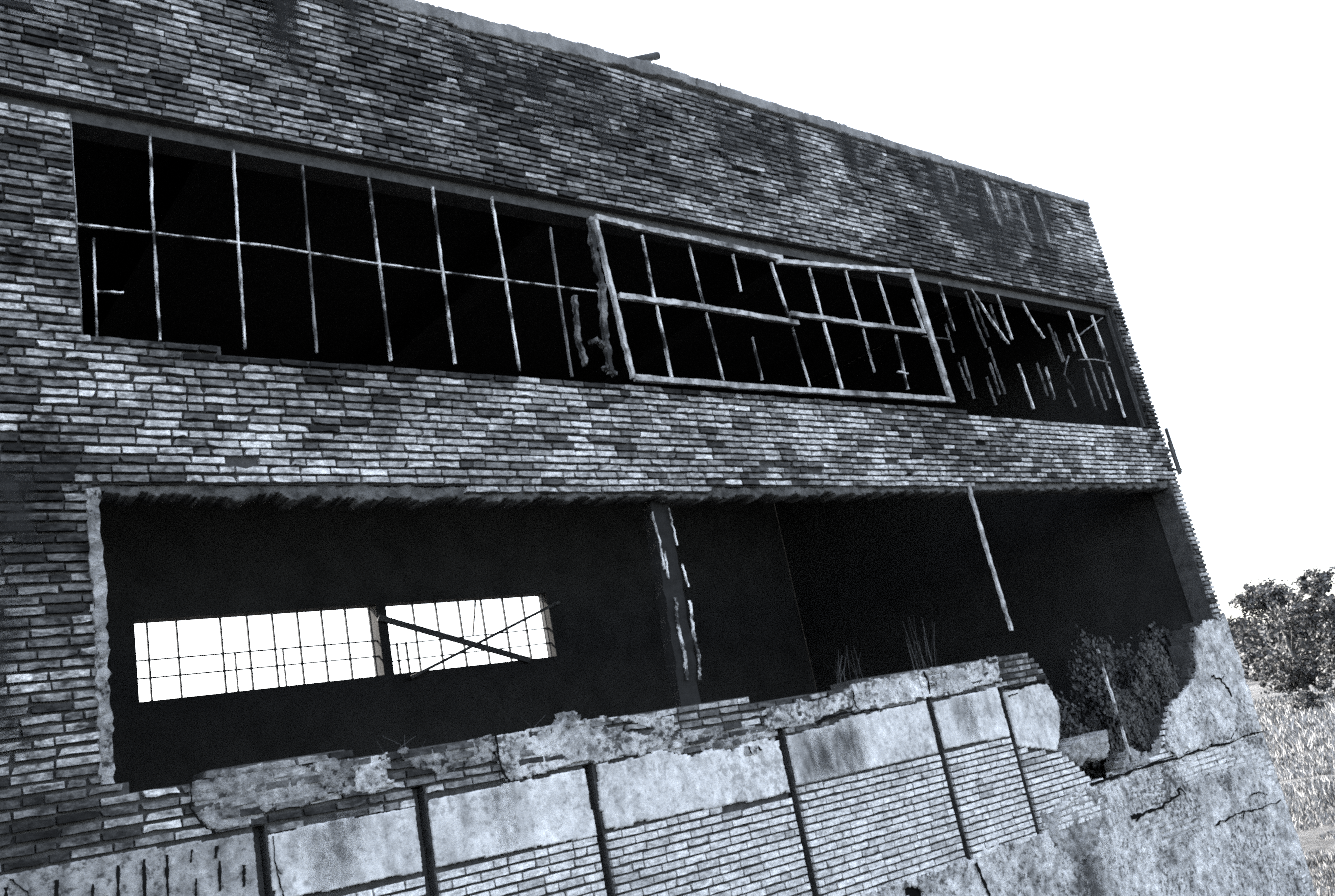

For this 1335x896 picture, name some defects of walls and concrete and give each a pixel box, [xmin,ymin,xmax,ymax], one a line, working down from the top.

crack [1211,675,1232,696]
peeling [188,656,1002,830]
peeling [1038,612,1261,864]
crack [1091,728,1264,822]
crack [1216,791,1281,826]